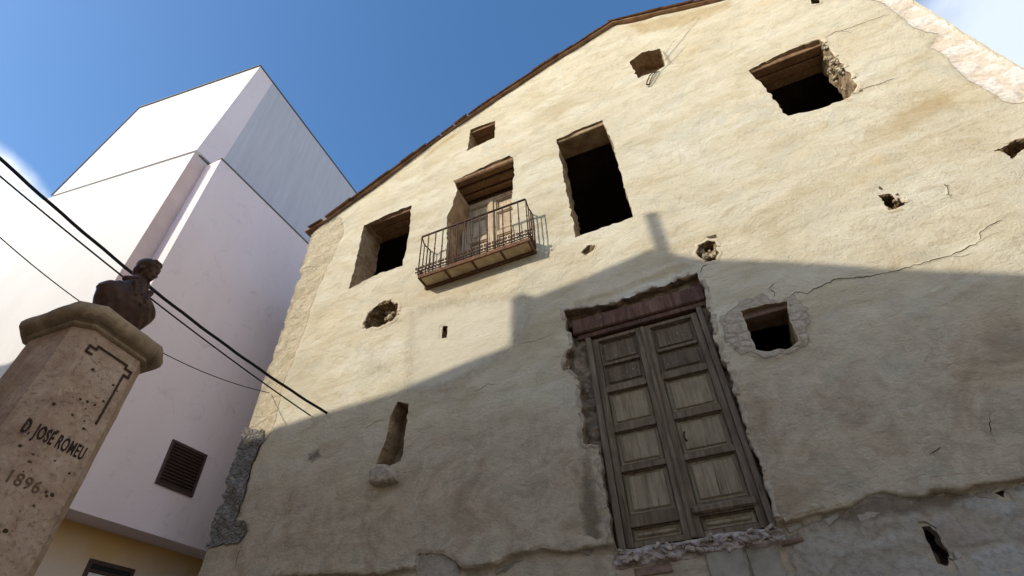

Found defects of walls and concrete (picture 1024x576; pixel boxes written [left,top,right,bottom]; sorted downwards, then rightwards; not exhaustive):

spalling [799,37,863,101]
peeling [876,0,1024,103]
spalling [995,136,1024,159]
spalling [878,186,909,213]
spalling [692,235,722,265]
crack [767,219,1004,298]
spalling [360,296,401,331]
flaking render [197,217,344,569]
flaking render [568,277,703,547]
flaking render [696,307,771,514]
flaking render [789,485,1024,576]